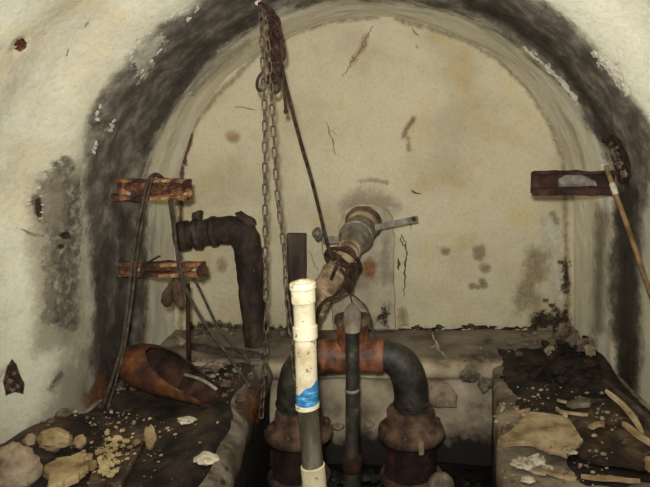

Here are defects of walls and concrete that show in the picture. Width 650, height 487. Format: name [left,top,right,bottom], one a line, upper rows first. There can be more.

spalling [10,38,30,54]
crack [342,26,373,77]
spalling [602,135,632,186]
spalling [26,187,45,222]
water stain [32,0,330,391]
water stain [400,0,650,393]
crack [397,224,412,295]
crack [397,323,529,358]
spalling [3,359,25,395]